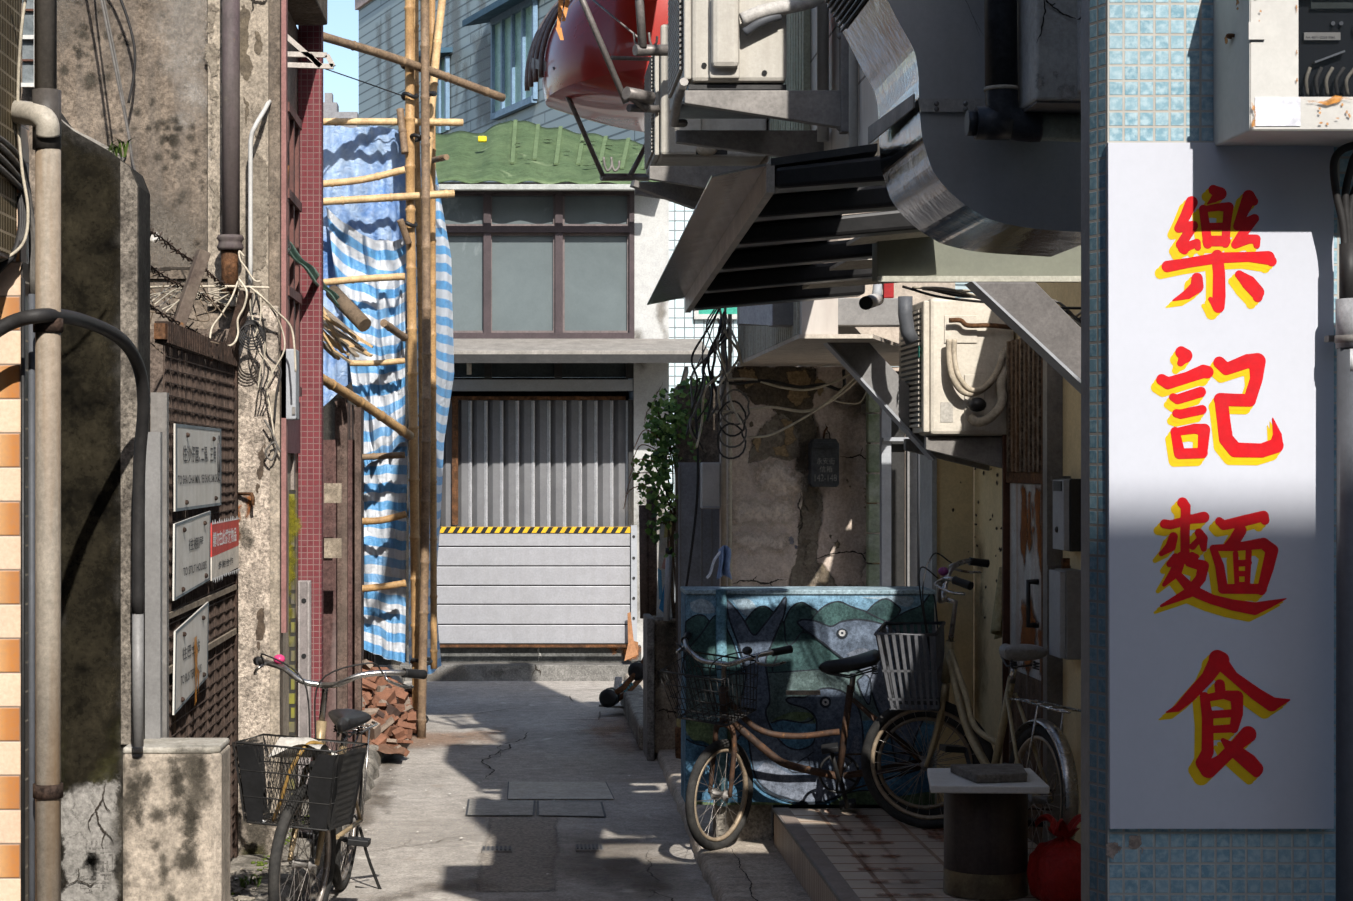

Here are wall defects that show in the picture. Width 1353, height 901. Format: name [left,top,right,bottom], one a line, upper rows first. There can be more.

damp [60,24,130,93]
crack [1037,0,1081,41]
damp [135,100,208,188]
corrosion [1318,95,1351,125]
damp [61,130,209,901]
flaking render [732,366,858,586]
corrosion [1020,485,1041,572]
corrosion [1020,600,1041,676]
crack [433,647,601,781]
crack [732,850,758,901]